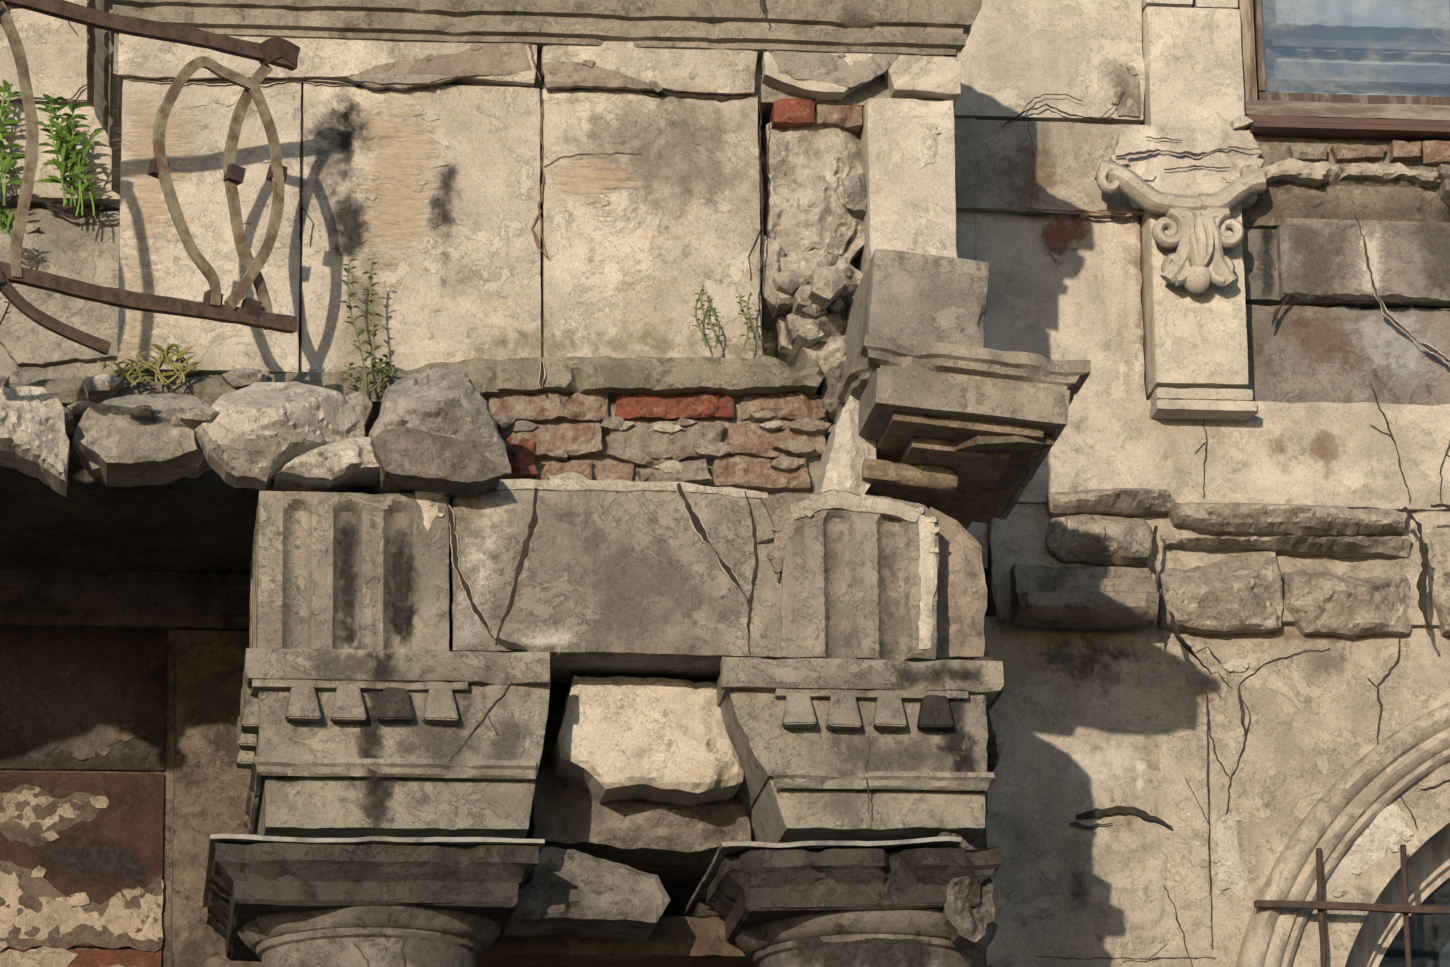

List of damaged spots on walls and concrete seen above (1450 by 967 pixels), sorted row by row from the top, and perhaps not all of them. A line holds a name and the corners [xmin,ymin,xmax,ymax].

water stain [431,166,455,226]
rust [1042,214,1089,263]
crack [992,89,1260,216]
crack [1271,215,1450,364]
flaking render [0,96,941,650]
crack [448,488,537,651]
crack [676,482,774,653]
crack [1367,383,1450,745]
peeling [0,784,109,847]
peeling [0,860,164,967]
crack [1035,525,1330,967]
peeling [1323,804,1413,898]